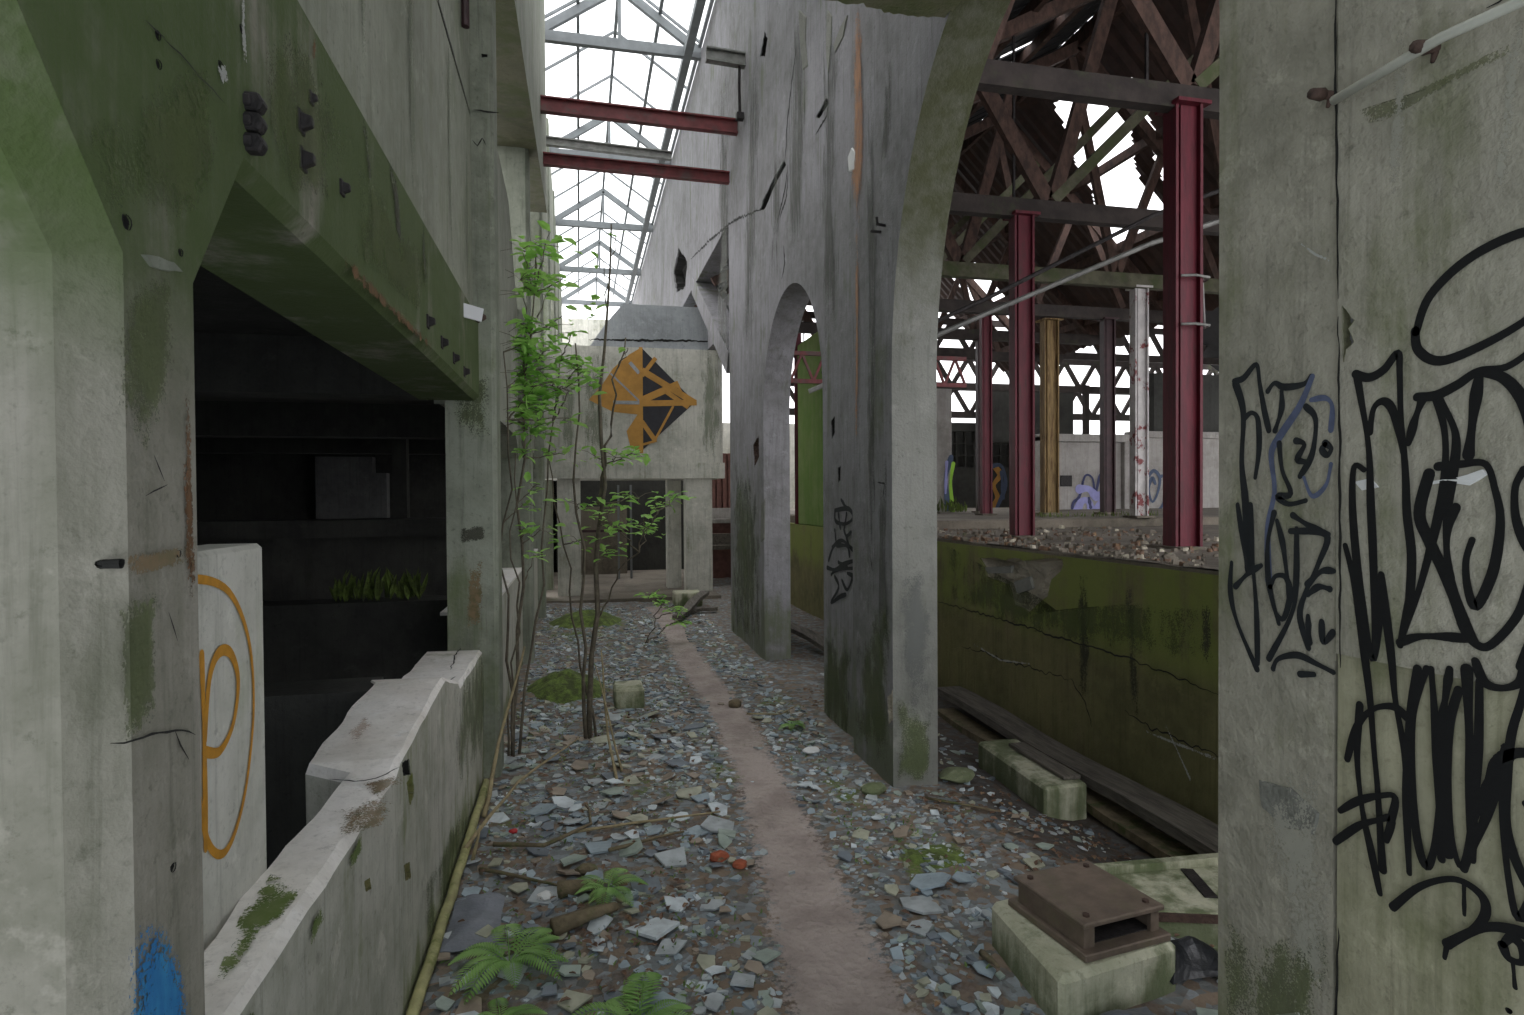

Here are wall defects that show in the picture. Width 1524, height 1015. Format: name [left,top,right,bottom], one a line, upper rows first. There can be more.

water stain [701,24,839,457]
corrosion [851,12,863,438]
water stain [120,279,174,449]
crack [1334,0,1342,668]
spalling [980,557,1063,612]
crack [939,602,1217,757]
spalling [402,759,414,805]
crack [1333,928,1341,1015]